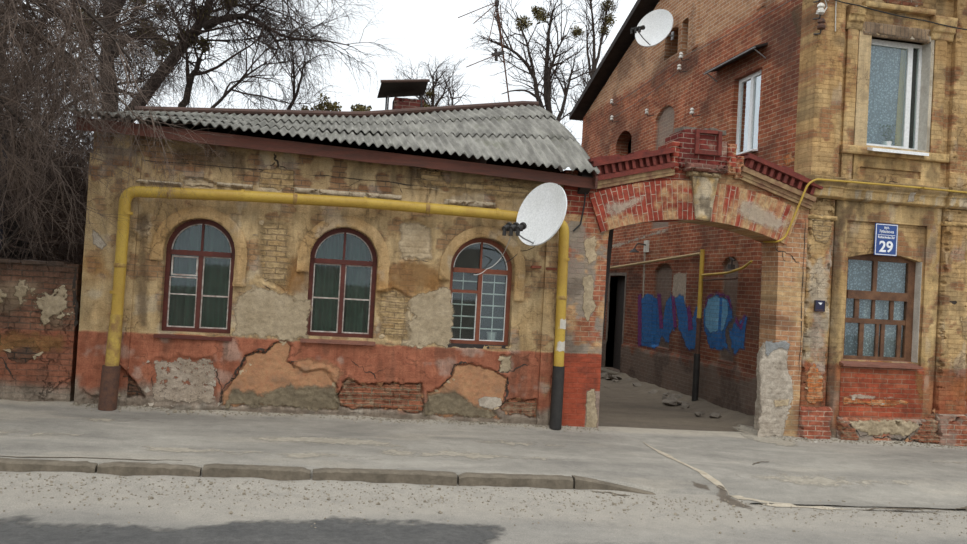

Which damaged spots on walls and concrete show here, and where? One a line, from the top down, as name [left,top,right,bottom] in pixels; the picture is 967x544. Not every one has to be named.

spalling [811,214,832,243]
crack [212,342,297,403]
flaking render [118,341,536,419]
flaking render [754,340,793,437]
spalling [805,363,823,404]
spalling [837,419,859,441]
spalling [905,409,940,444]